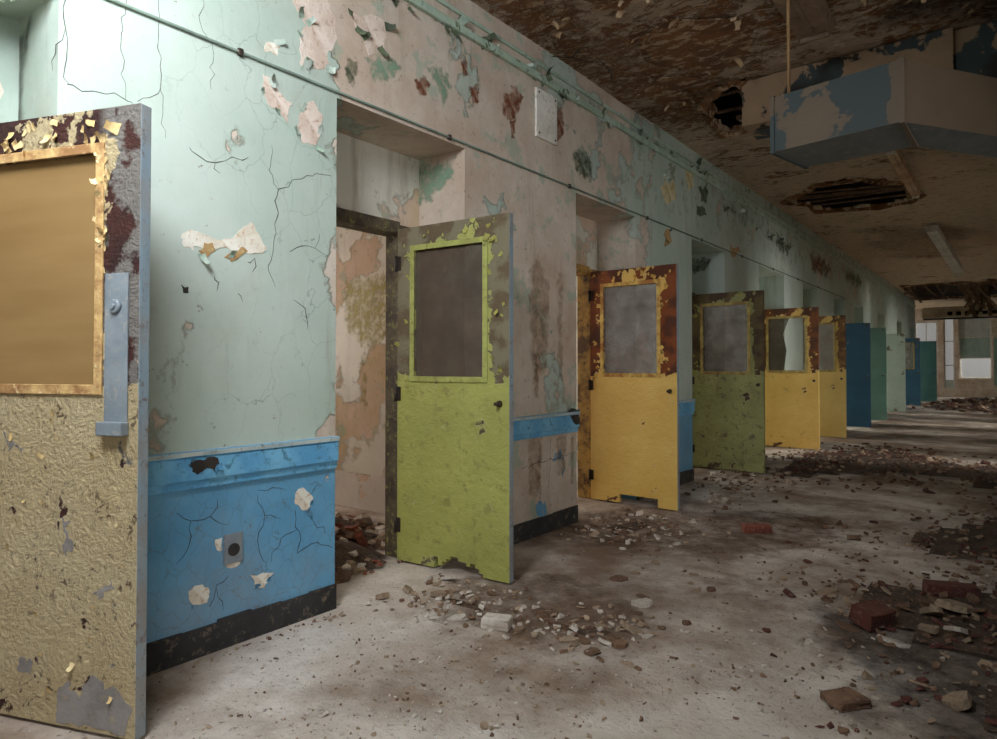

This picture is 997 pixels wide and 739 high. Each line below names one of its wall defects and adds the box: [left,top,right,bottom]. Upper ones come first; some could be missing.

peeling [293,0,337,74]
peeling [348,8,396,56]
crack [51,0,166,138]
peeling [261,74,324,152]
spalling [181,222,267,264]
crack [189,145,330,285]
peeling [189,457,224,475]
crack [177,499,227,561]
crack [257,487,332,570]
spalling [294,487,313,515]
spalling [188,584,210,610]
spalling [250,573,273,589]